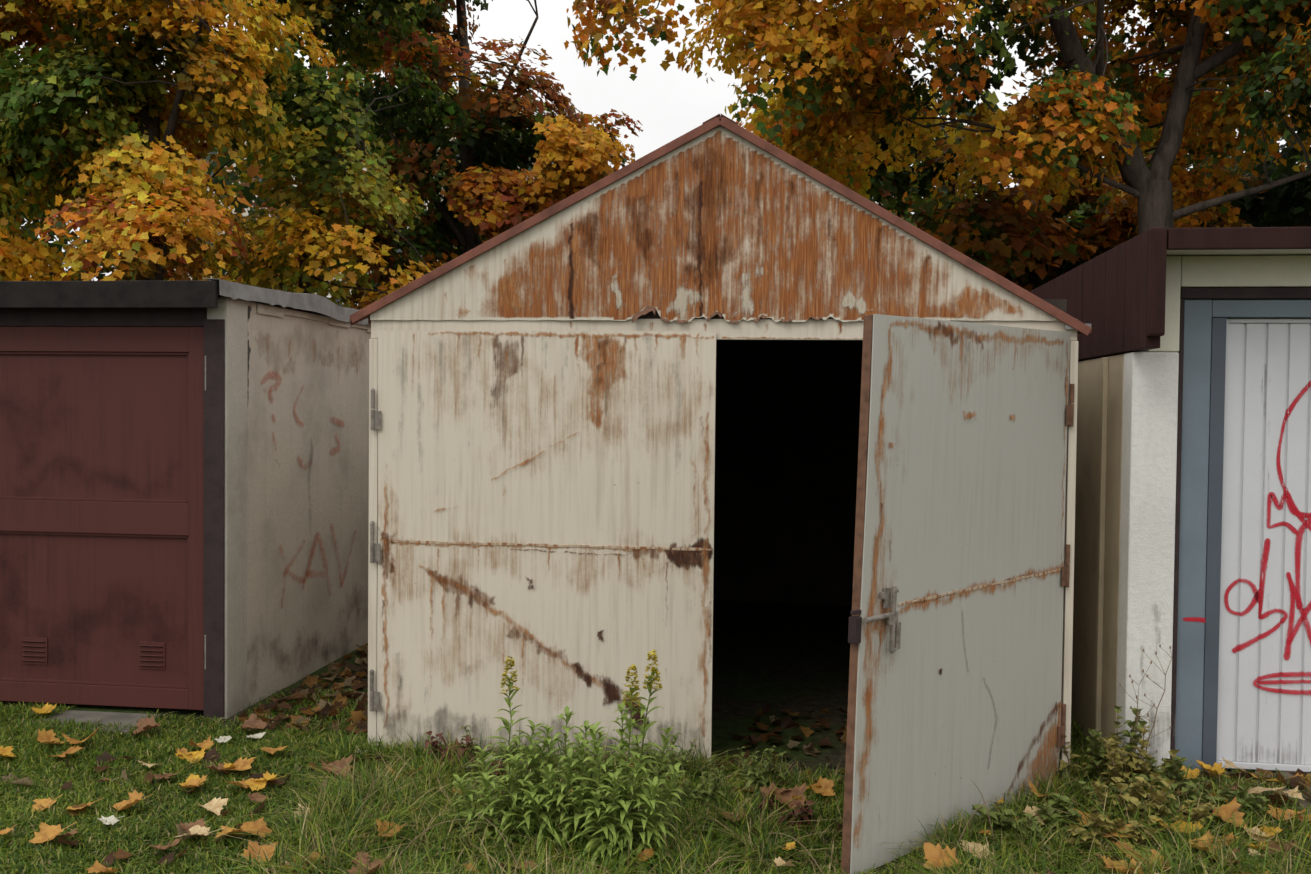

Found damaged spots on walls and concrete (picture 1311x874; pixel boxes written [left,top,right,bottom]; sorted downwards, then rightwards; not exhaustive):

rust [441,131,1069,467]
rust [381,487,712,730]
rust [860,484,1063,794]